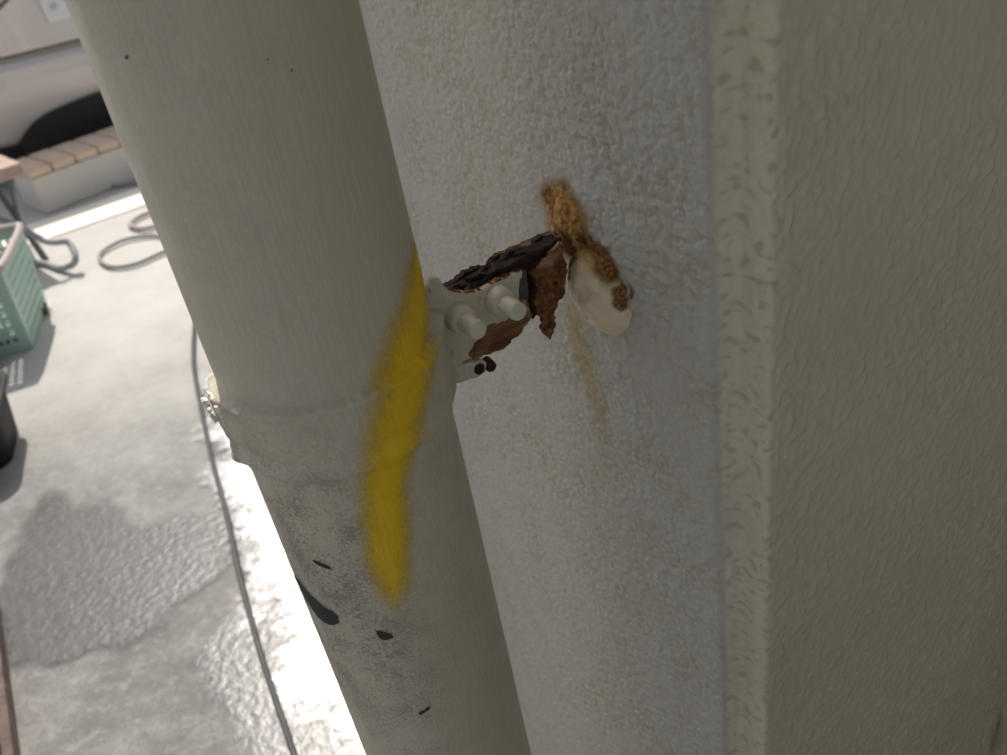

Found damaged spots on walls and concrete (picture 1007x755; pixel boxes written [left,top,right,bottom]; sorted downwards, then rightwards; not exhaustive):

rust [469,183,633,360]
damp [0,494,236,664]